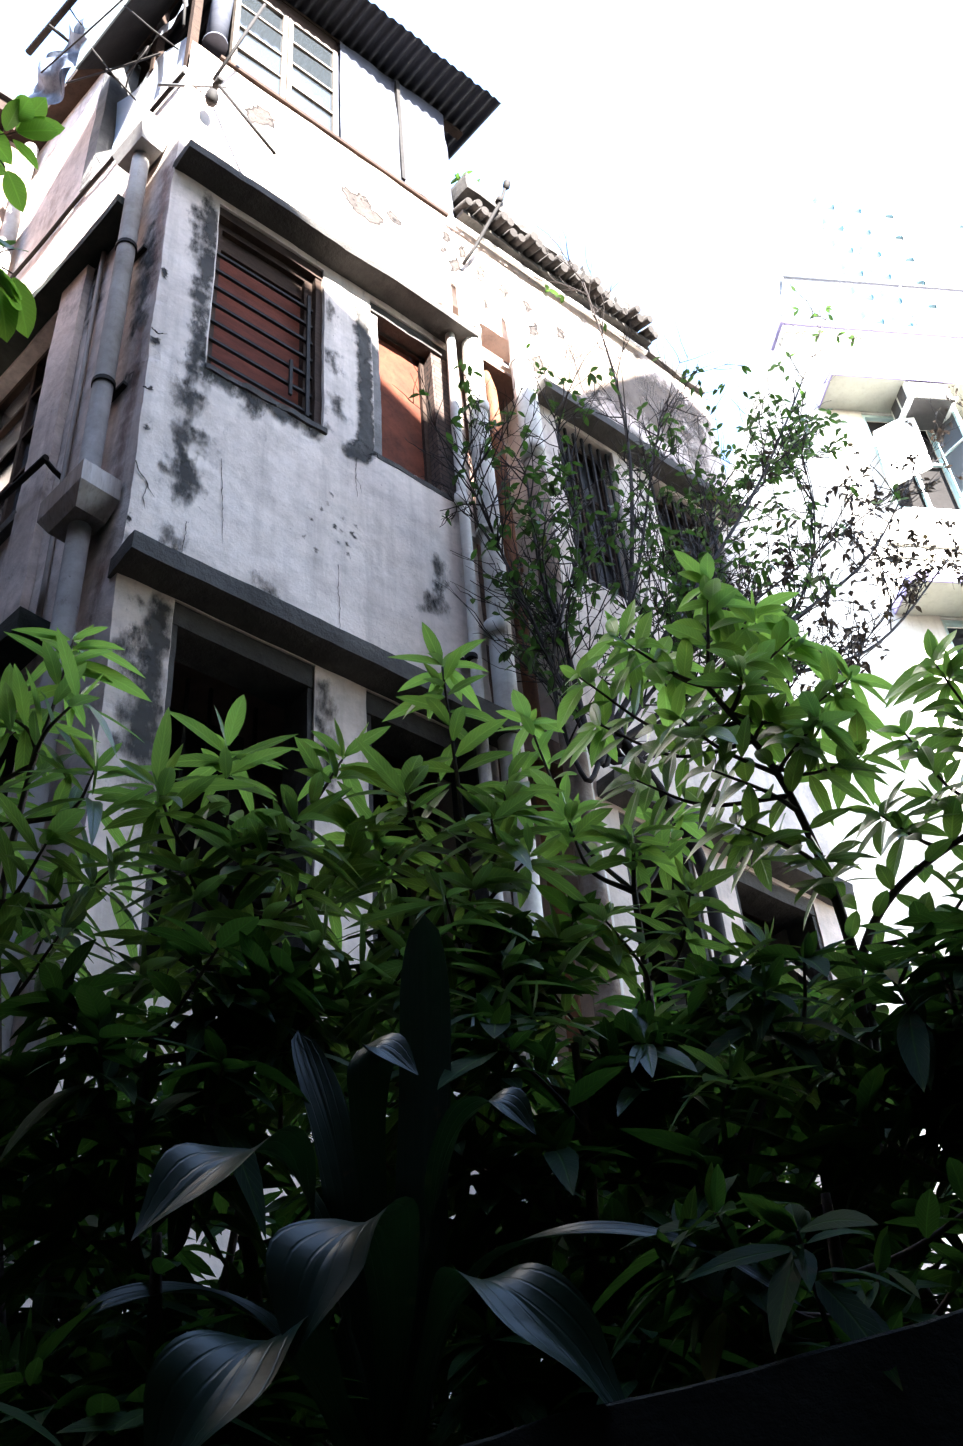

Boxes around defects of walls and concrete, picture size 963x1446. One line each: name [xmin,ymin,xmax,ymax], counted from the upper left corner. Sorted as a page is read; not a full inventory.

spalling [341,186,402,225]
leakage [159,197,345,504]
leakage [422,555,448,611]
leakage [112,594,173,809]